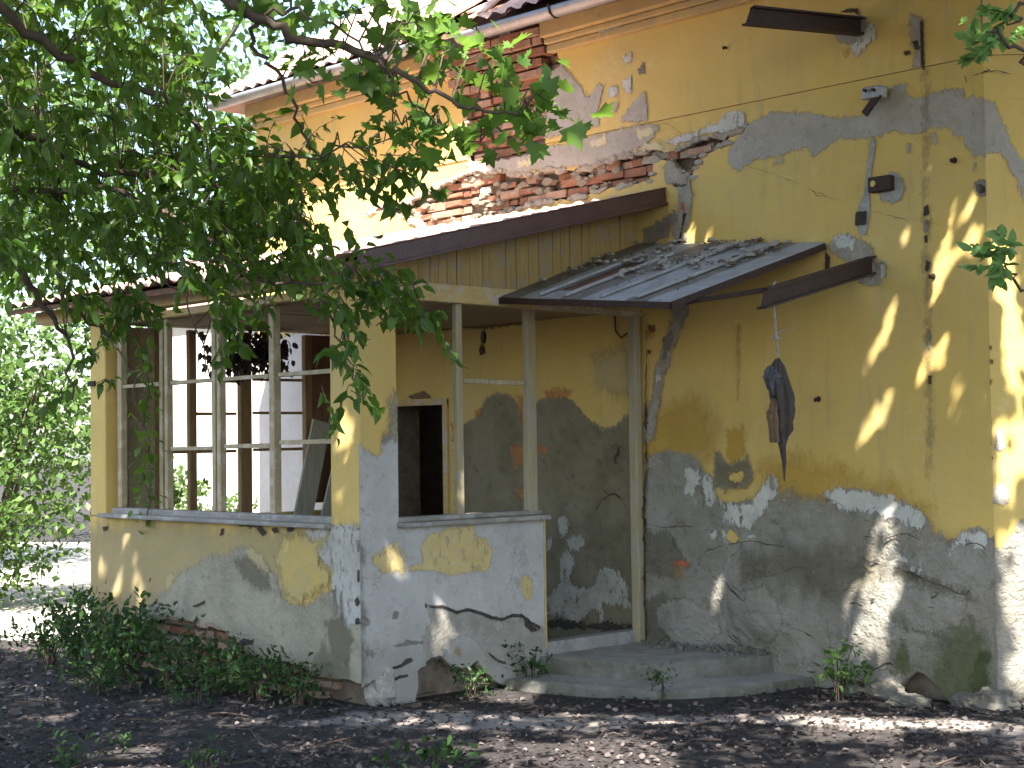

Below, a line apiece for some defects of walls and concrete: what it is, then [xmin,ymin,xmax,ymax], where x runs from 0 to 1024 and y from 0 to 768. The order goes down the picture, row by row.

peeling [364,23,1024,229]
peeling [259,333,327,513]
peeling [96,387,1024,707]
crack [844,533,970,609]